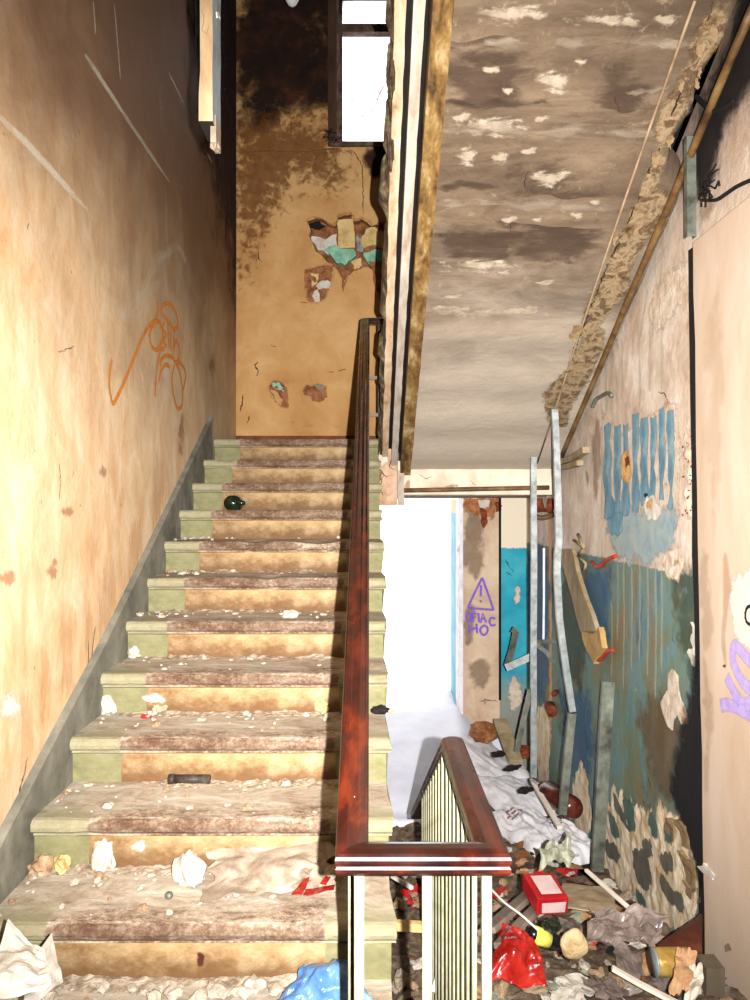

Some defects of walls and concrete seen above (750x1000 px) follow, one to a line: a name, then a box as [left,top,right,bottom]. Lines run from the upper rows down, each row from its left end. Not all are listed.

damp [448,36,524,108]
damp [236,112,348,256]
flaking render [302,0,396,497]
damp [439,221,594,257]
flaking render [543,4,727,427]
damp [458,511,482,578]
flaking render [463,498,502,529]
peeling [601,402,692,582]
damp [464,606,475,645]
damp [470,659,489,687]
peeling [660,669,686,730]
flaking render [604,784,715,931]